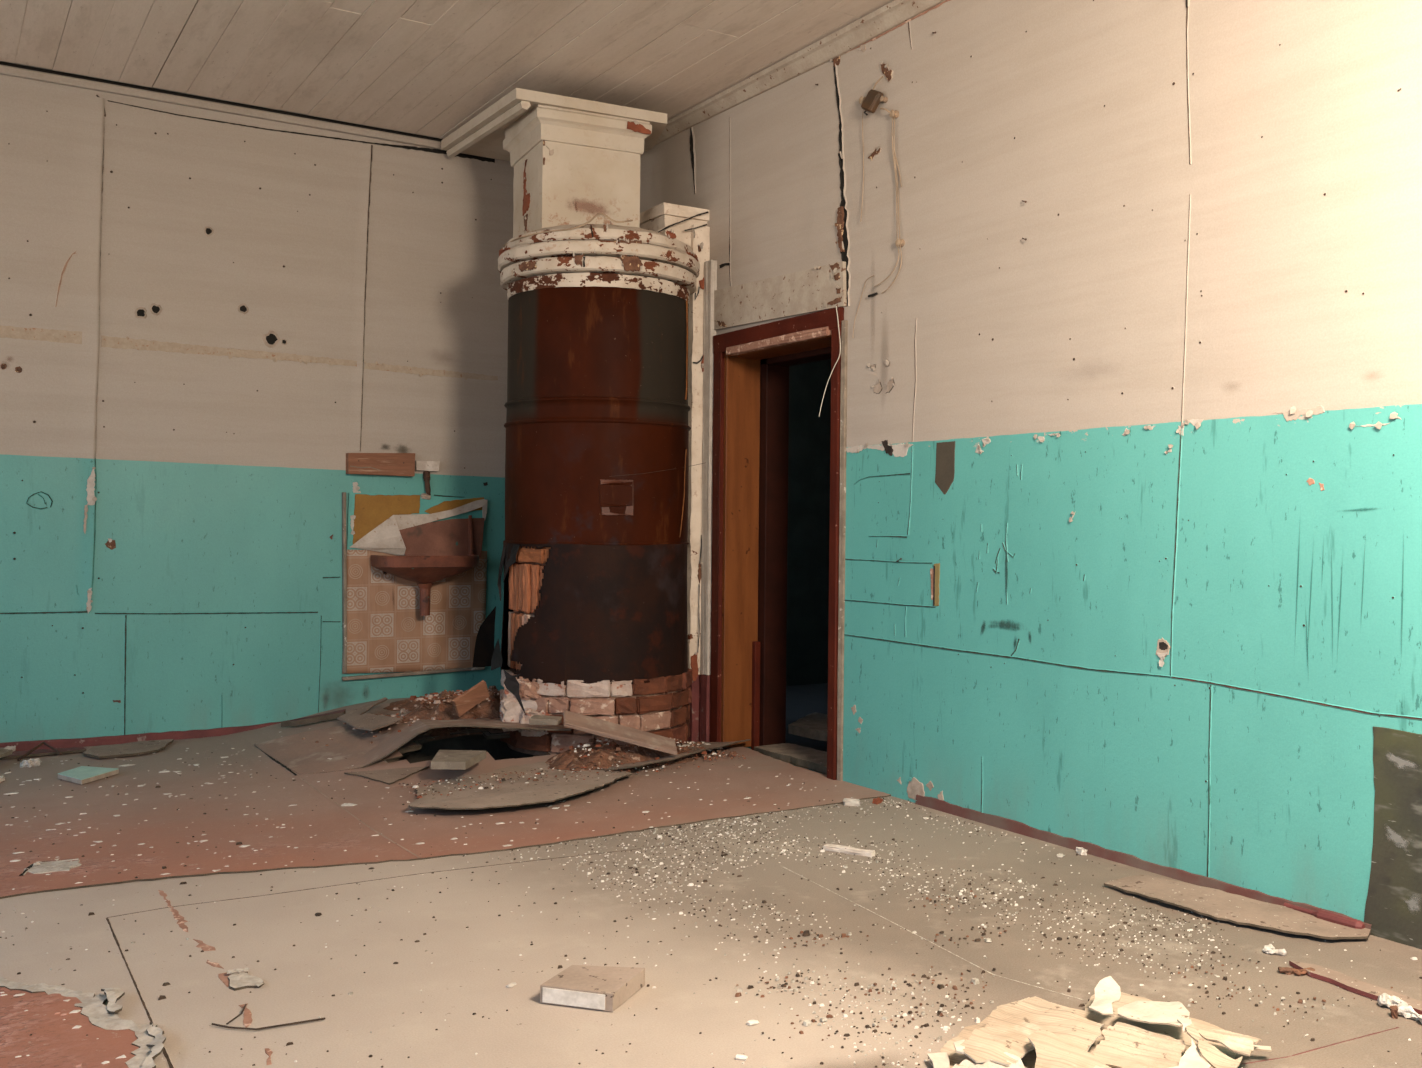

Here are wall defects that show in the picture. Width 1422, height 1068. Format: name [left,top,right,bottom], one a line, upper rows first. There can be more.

crack [833,64,851,307]
peeling [499,247,537,272]
peeling [573,223,643,272]
peeling [687,242,704,290]
peeling [814,223,843,307]
crack [844,0,1422,877]
peeling [1164,419,1204,454]
peeling [1278,406,1325,421]
peeling [1349,412,1402,429]